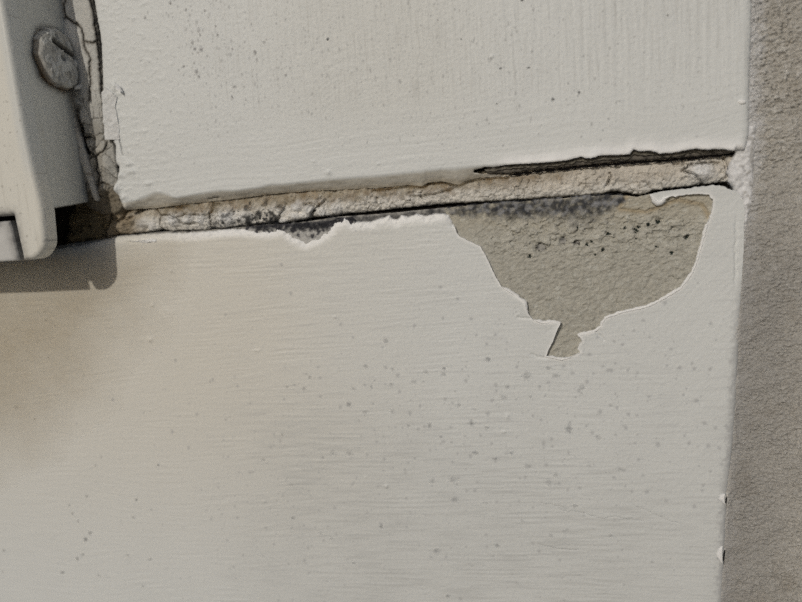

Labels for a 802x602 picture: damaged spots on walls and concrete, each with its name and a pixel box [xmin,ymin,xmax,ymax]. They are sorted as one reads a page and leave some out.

crack [64,0,123,187]
peeling [245,217,356,244]
crack [105,152,735,238]
peeling [445,194,712,361]